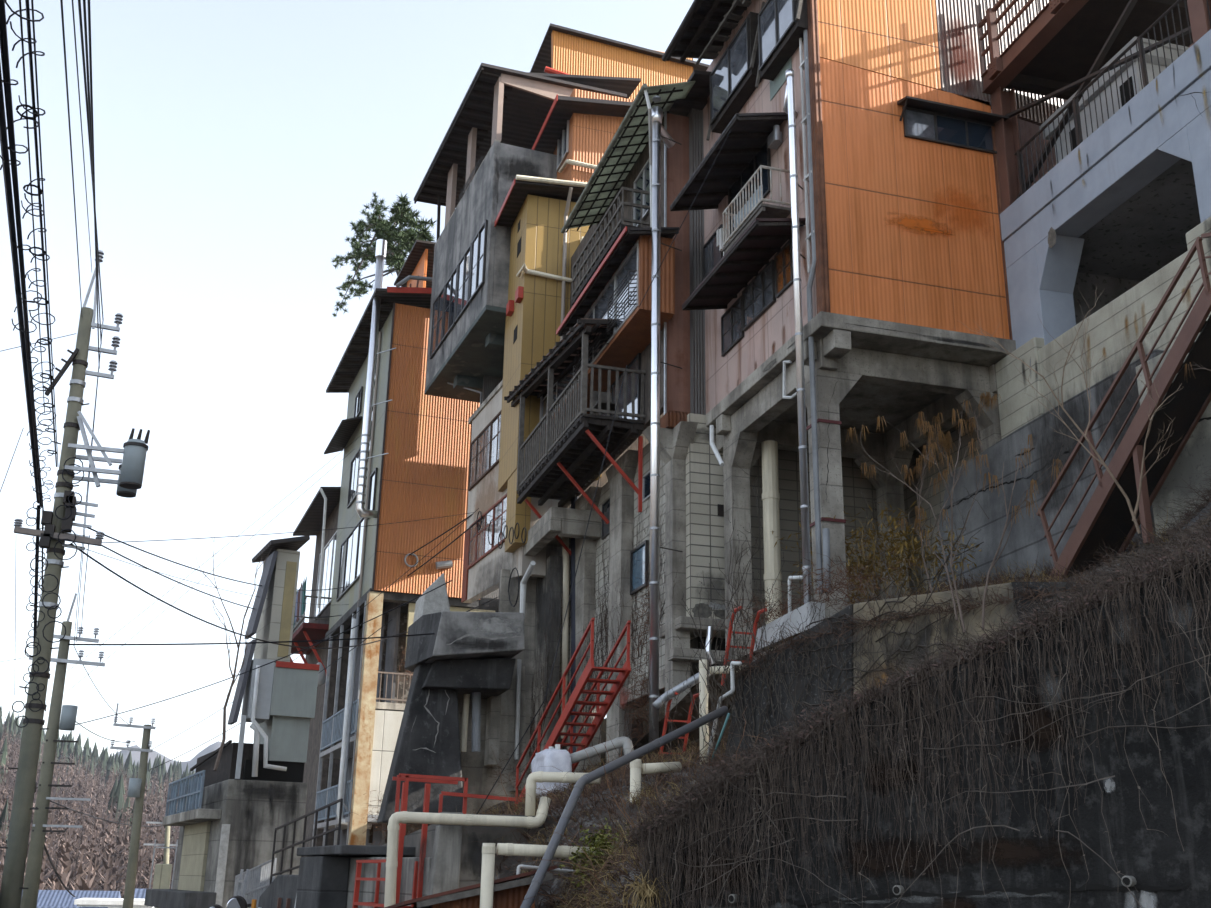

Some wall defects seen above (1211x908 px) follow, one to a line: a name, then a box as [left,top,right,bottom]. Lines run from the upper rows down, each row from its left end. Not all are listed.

rust [948,21,979,90]
crack [411,689,450,753]
water stain [1141,894,1154,908]